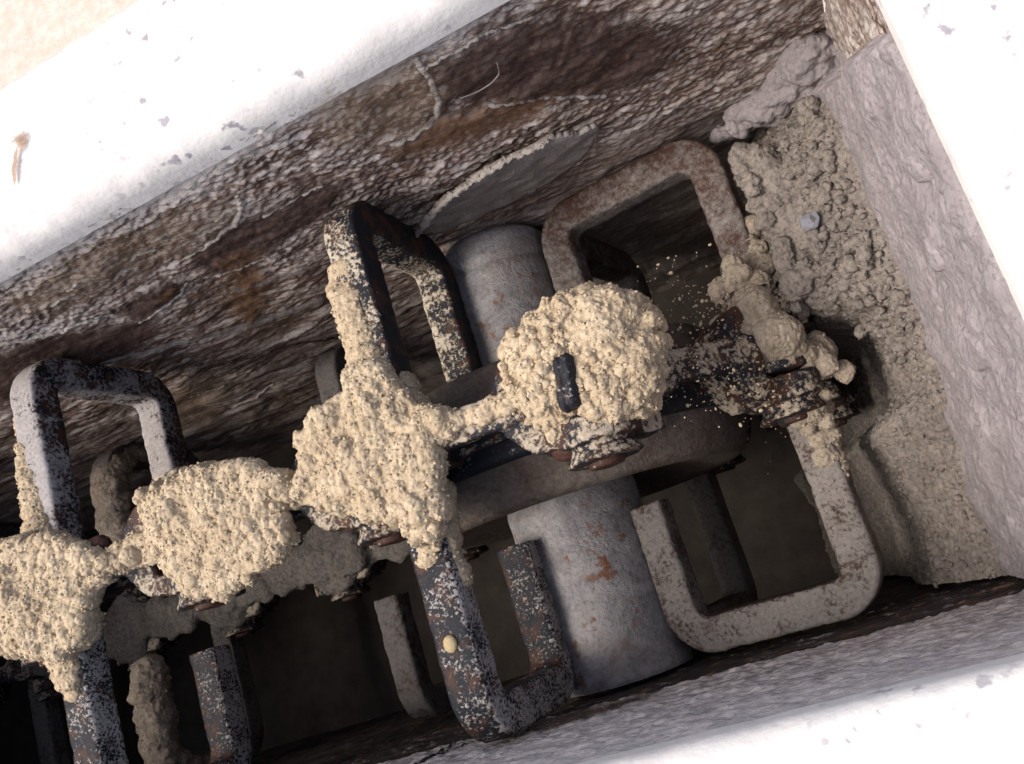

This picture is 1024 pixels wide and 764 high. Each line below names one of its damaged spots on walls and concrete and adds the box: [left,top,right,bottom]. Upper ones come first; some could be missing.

rust [11,132,27,185]
spalling [184,181,350,278]
peeling [114,232,174,281]
spalling [0,277,189,405]
spalling [553,352,581,413]
spalling [551,450,573,462]
spalling [88,535,112,549]